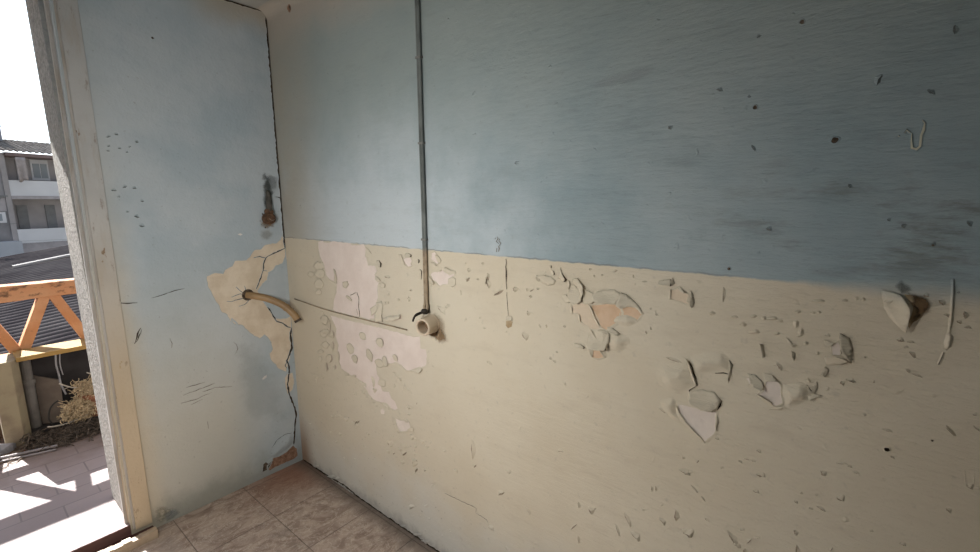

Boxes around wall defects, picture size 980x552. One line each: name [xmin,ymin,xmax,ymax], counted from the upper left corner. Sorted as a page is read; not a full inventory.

peeling [204,234,296,396]
peeling [307,239,429,434]
peeling [398,251,658,360]
peeling [633,275,694,308]
peeling [746,337,795,410]
peeling [806,333,853,401]
peeling [881,290,971,358]
peeling [676,389,723,444]
spalling [262,444,299,473]